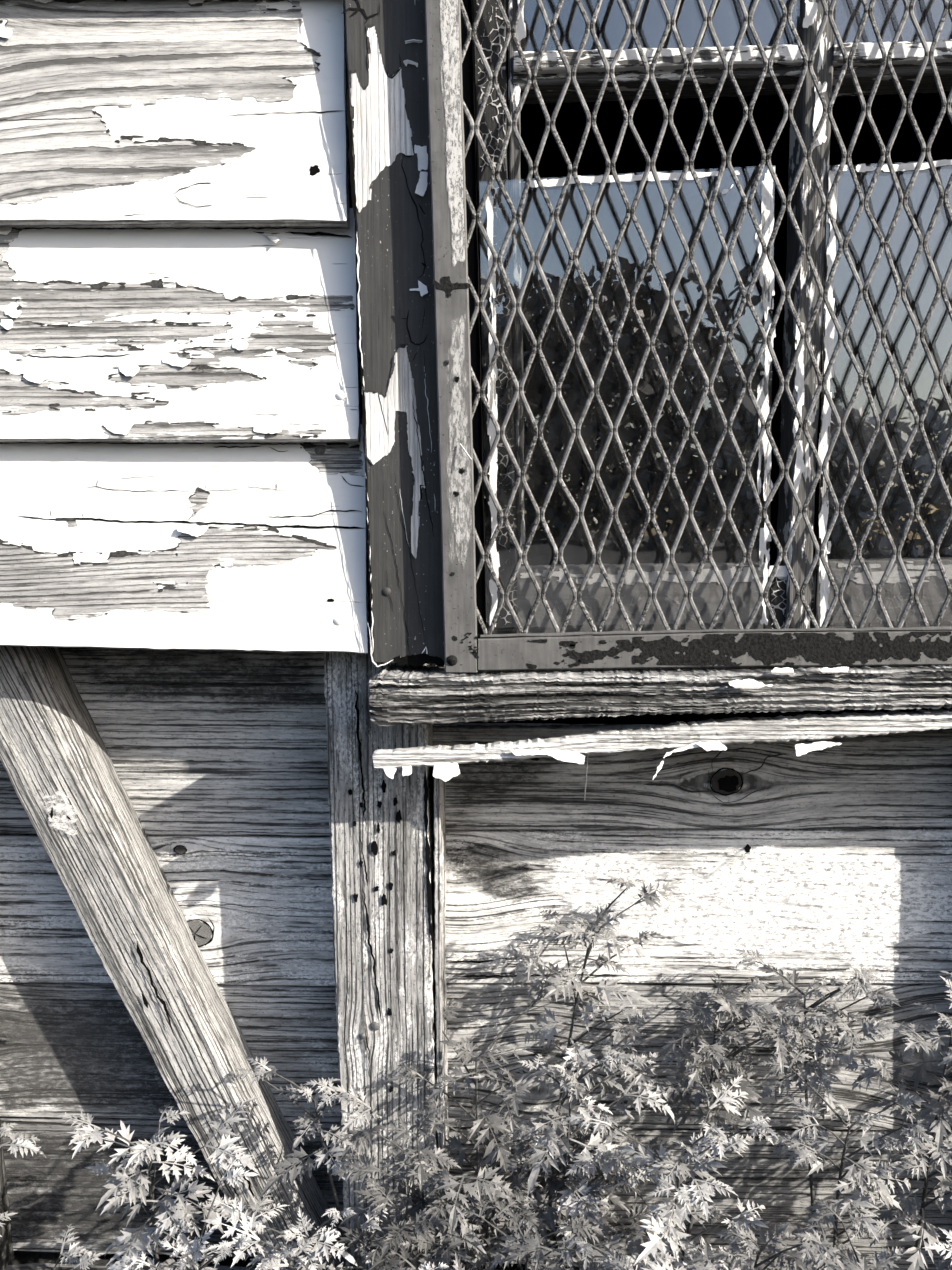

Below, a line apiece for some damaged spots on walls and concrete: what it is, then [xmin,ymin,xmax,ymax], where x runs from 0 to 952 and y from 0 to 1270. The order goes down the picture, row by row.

crack [342,0,380,23]
peeling [0,0,321,204]
crack [173,182,214,207]
crack [253,230,352,238]
crack [401,154,427,278]
peeling [0,227,425,559]
peeling [0,487,337,620]
crack [15,308,435,1078]
peeling [510,749,585,764]
peeling [653,741,727,779]
peeling [795,741,842,757]
crack [431,1017,439,1081]